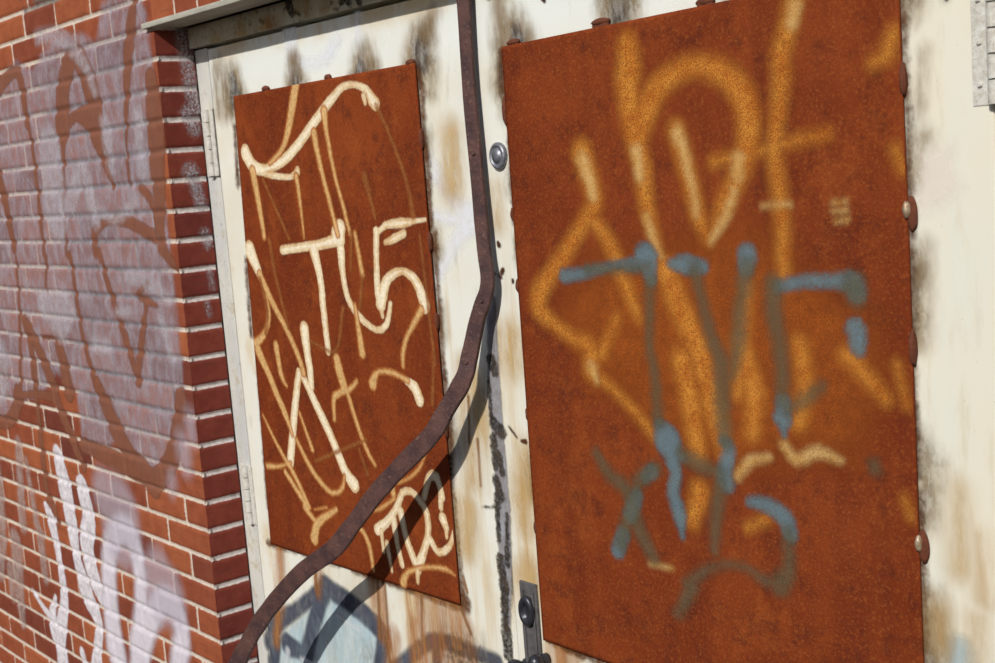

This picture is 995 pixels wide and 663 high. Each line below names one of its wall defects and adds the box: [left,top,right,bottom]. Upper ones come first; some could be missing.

rust [287,58,303,86]
rust [495,0,533,101]
rust [407,15,447,397]
rust [445,127,457,195]
rust [266,540,297,582]
rust [351,422,474,663]
rust [467,375,486,485]
peeling [484,296,513,662]
rust [518,459,532,528]
rust [549,642,607,663]